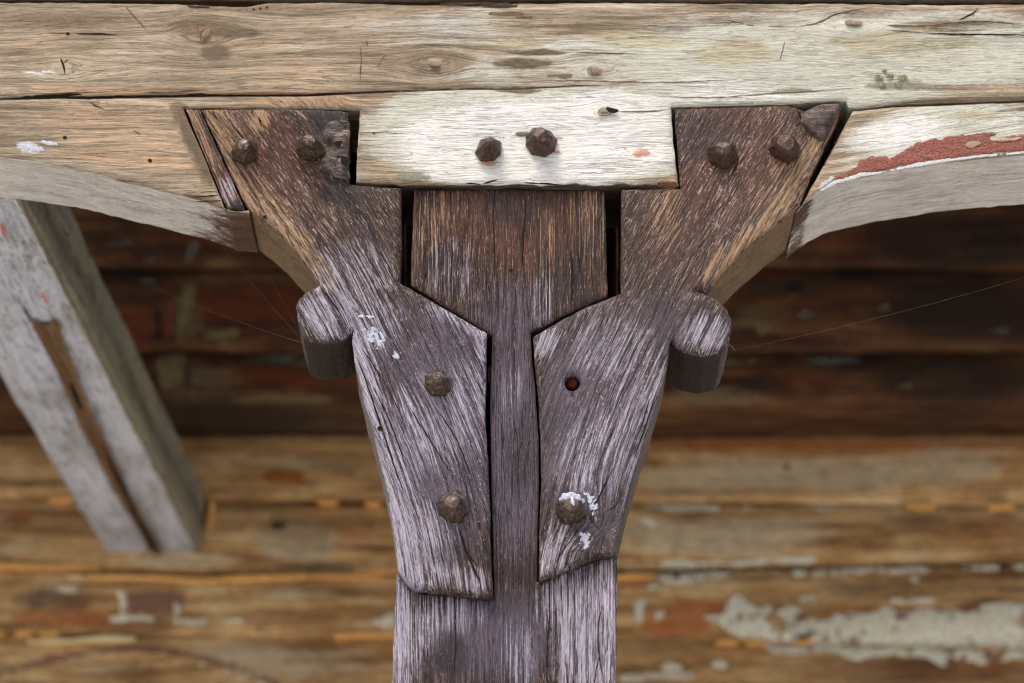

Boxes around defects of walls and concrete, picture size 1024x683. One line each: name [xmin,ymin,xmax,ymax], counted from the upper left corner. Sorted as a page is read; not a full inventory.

peeling [835,132,1024,179]
peeling [633,556,931,623]
peeling [703,587,1024,666]
peeling [619,662,695,683]
peeling [710,660,728,669]